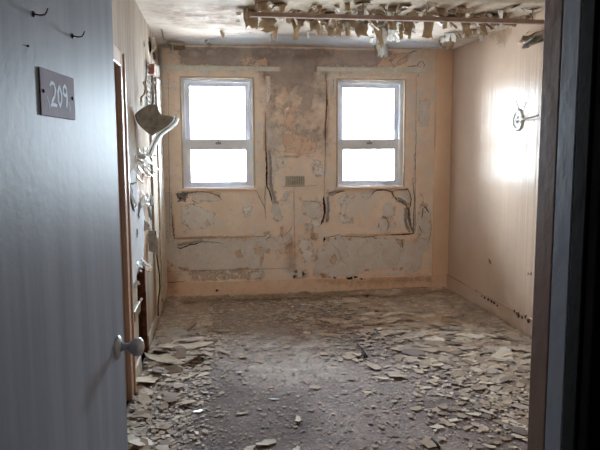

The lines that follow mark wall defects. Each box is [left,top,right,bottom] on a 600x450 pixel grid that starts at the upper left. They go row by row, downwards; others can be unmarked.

peeling [235,0,545,68]
peeling [129,104,179,290]
peeling [165,192,215,243]
crack [169,74,431,262]
peeling [290,201,323,279]